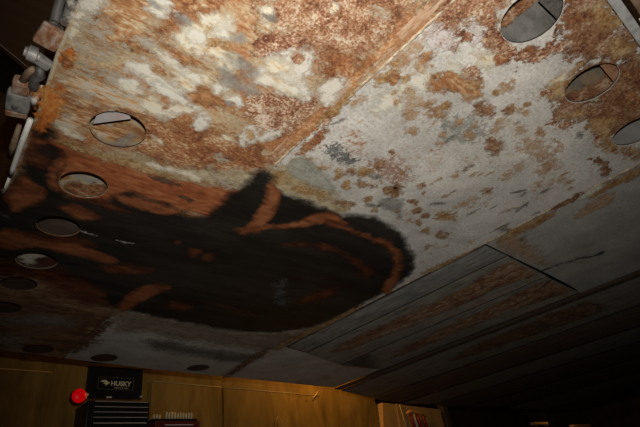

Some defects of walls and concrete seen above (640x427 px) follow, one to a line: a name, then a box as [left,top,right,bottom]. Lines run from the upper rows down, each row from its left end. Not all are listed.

rust [89,0,224,70]
rust [25,48,279,216]
rust [150,0,640,243]
leakage [4,152,65,212]
leakage [0,229,150,274]
leakage [61,205,99,220]
leakage [89,137,402,294]
leakage [109,284,320,362]